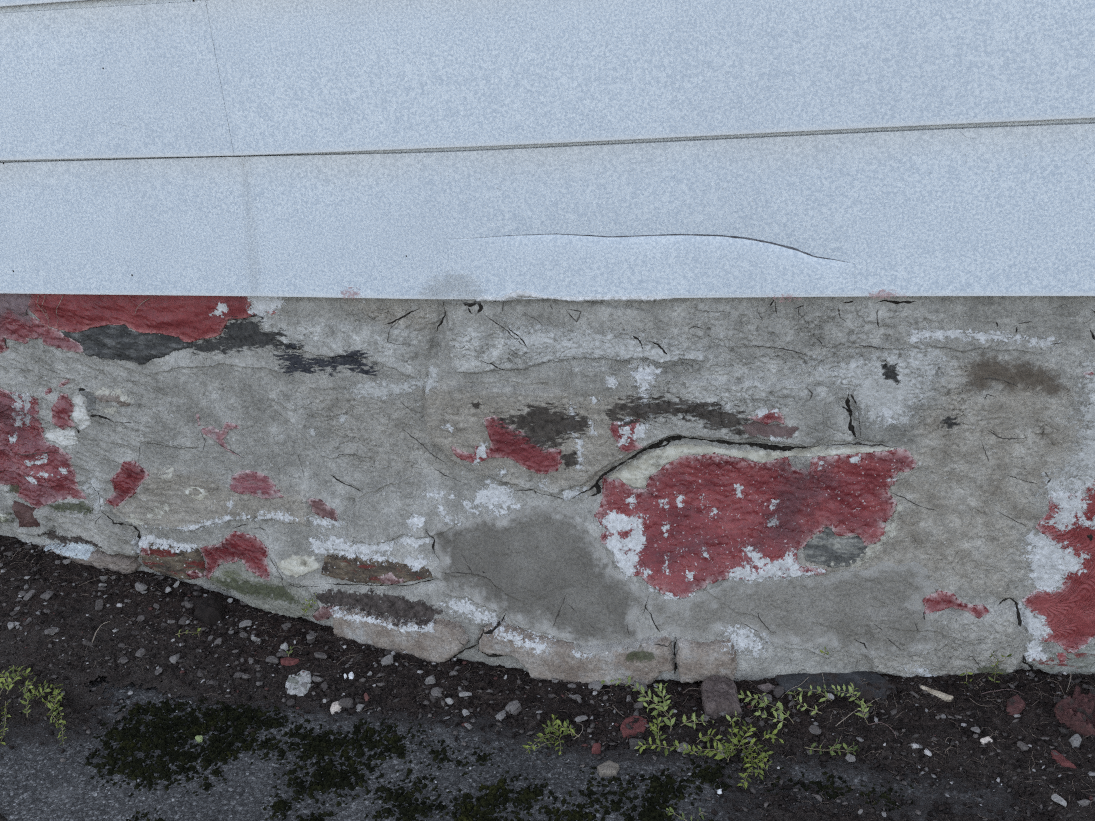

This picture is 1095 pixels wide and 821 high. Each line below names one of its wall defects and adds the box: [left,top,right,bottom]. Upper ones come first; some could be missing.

peeling [0,294,276,365]
water stain [192,296,439,400]
crack [633,336,667,354]
crack [752,299,823,354]
crack [982,377,1030,398]
peeling [0,379,131,509]
peeling [104,460,149,509]
crack [517,393,896,500]
peeling [594,419,917,599]
crack [982,429,1051,484]
peeling [186,531,321,581]
peeling [1022,481,1095,664]